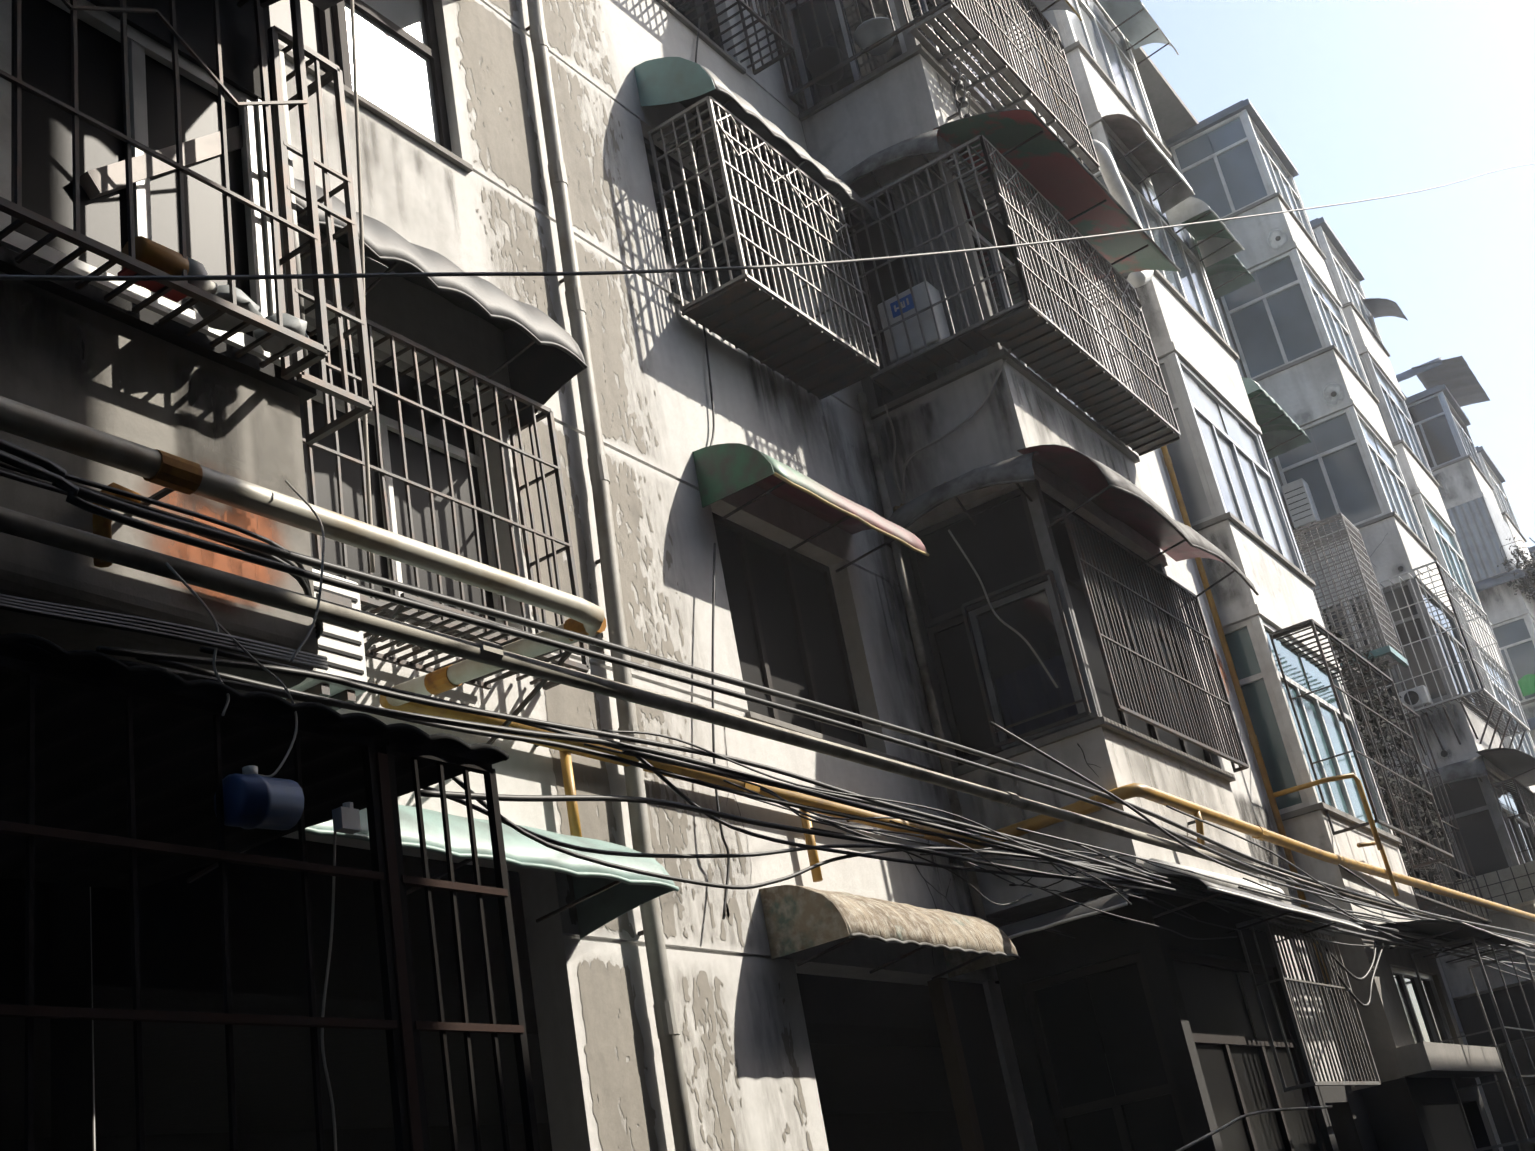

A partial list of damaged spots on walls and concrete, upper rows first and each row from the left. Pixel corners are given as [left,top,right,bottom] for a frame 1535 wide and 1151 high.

peeling [456,0,558,323]
peeling [542,0,692,671]
rust [153,485,279,584]
rust [193,586,241,604]
peeling [505,404,593,603]
peeling [532,608,569,632]
peeling [578,957,659,1151]
peeling [680,970,742,1151]
peeling [767,982,813,1151]